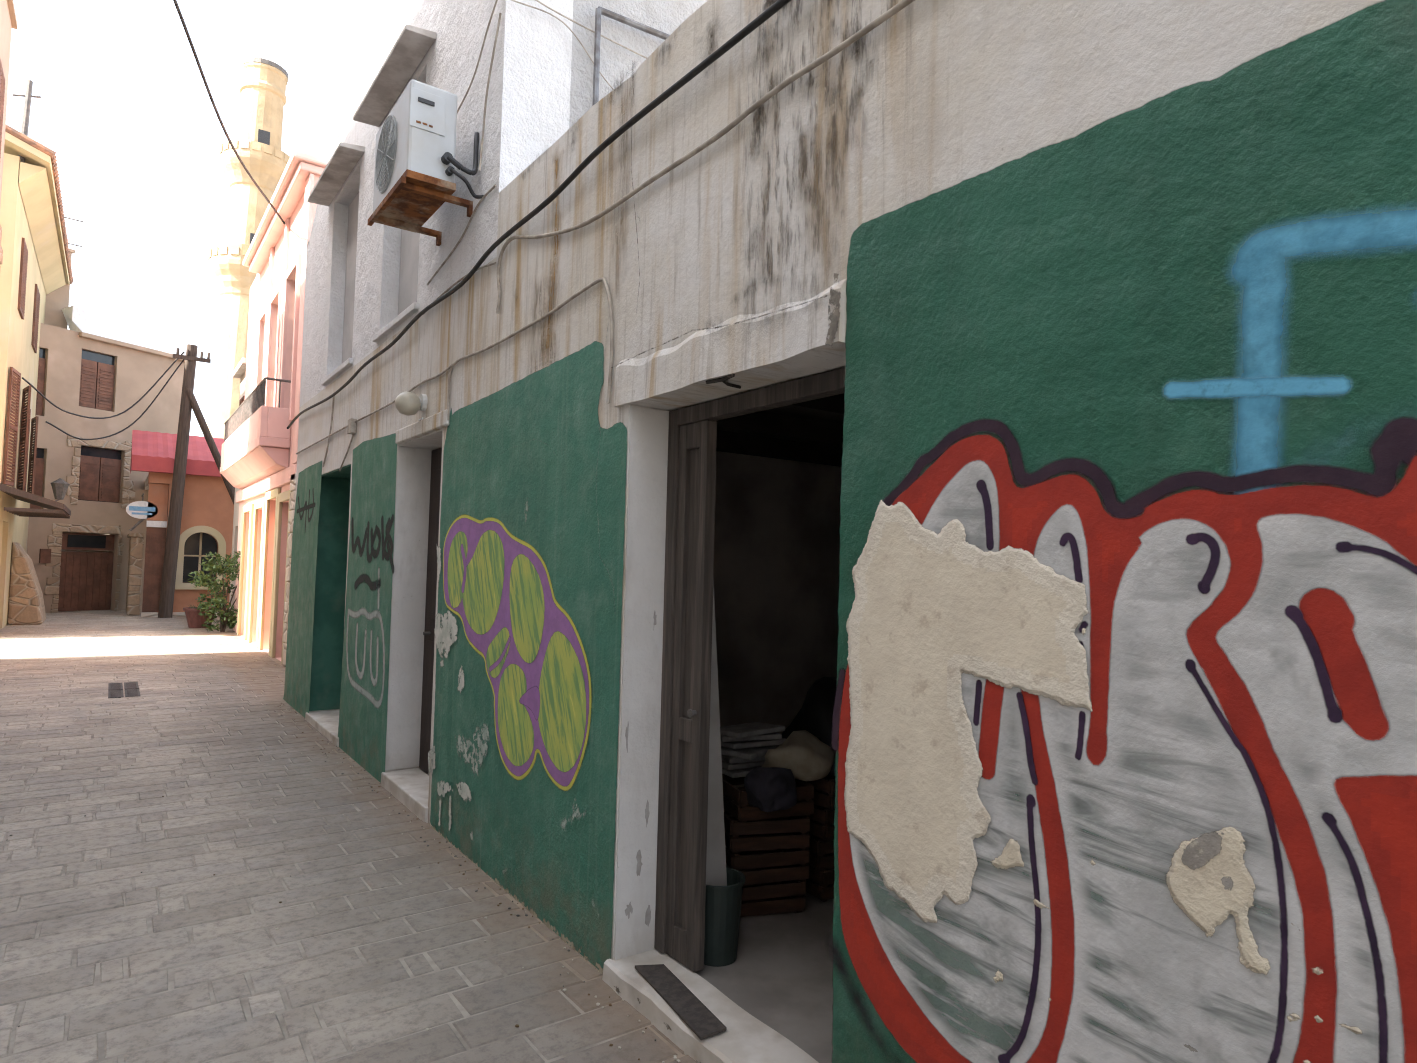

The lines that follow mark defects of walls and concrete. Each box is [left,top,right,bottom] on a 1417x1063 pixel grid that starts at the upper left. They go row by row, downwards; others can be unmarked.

damp [751,0,865,283]
peeling [434,611,464,693]
peeling [844,500,1093,923]
peeling [1166,827,1271,975]